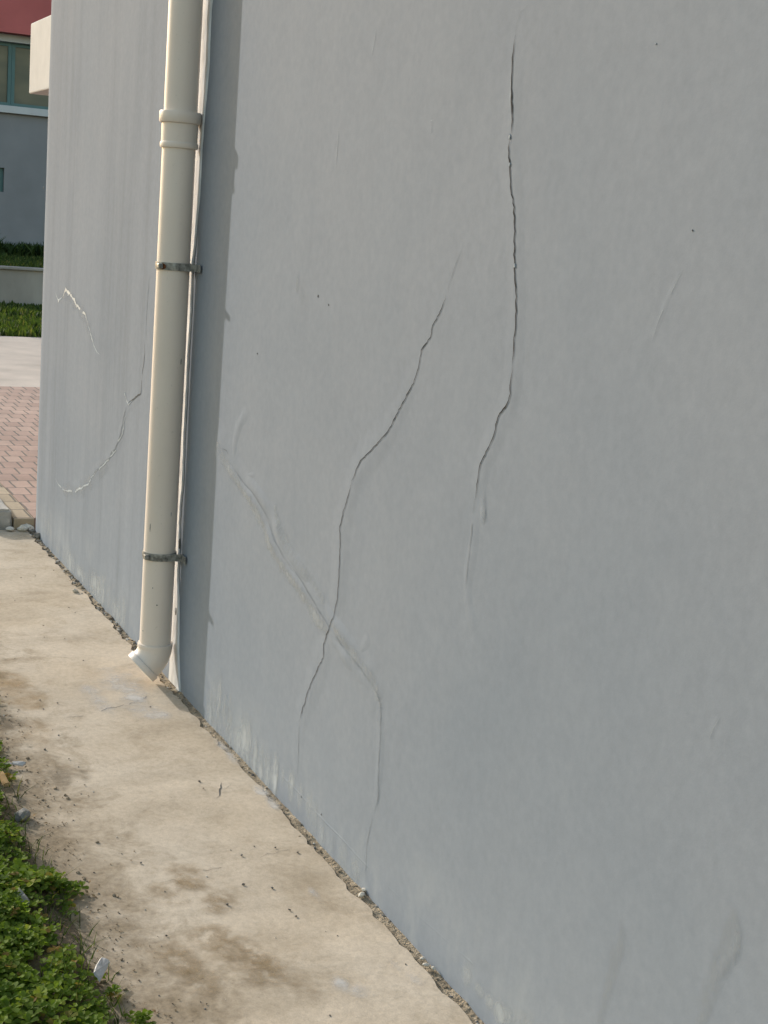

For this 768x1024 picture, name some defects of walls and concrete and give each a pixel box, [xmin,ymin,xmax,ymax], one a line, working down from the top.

crack [56,284,149,502]
crack [294,251,461,774]
crack [462,6,527,654]
crack [365,692,385,874]